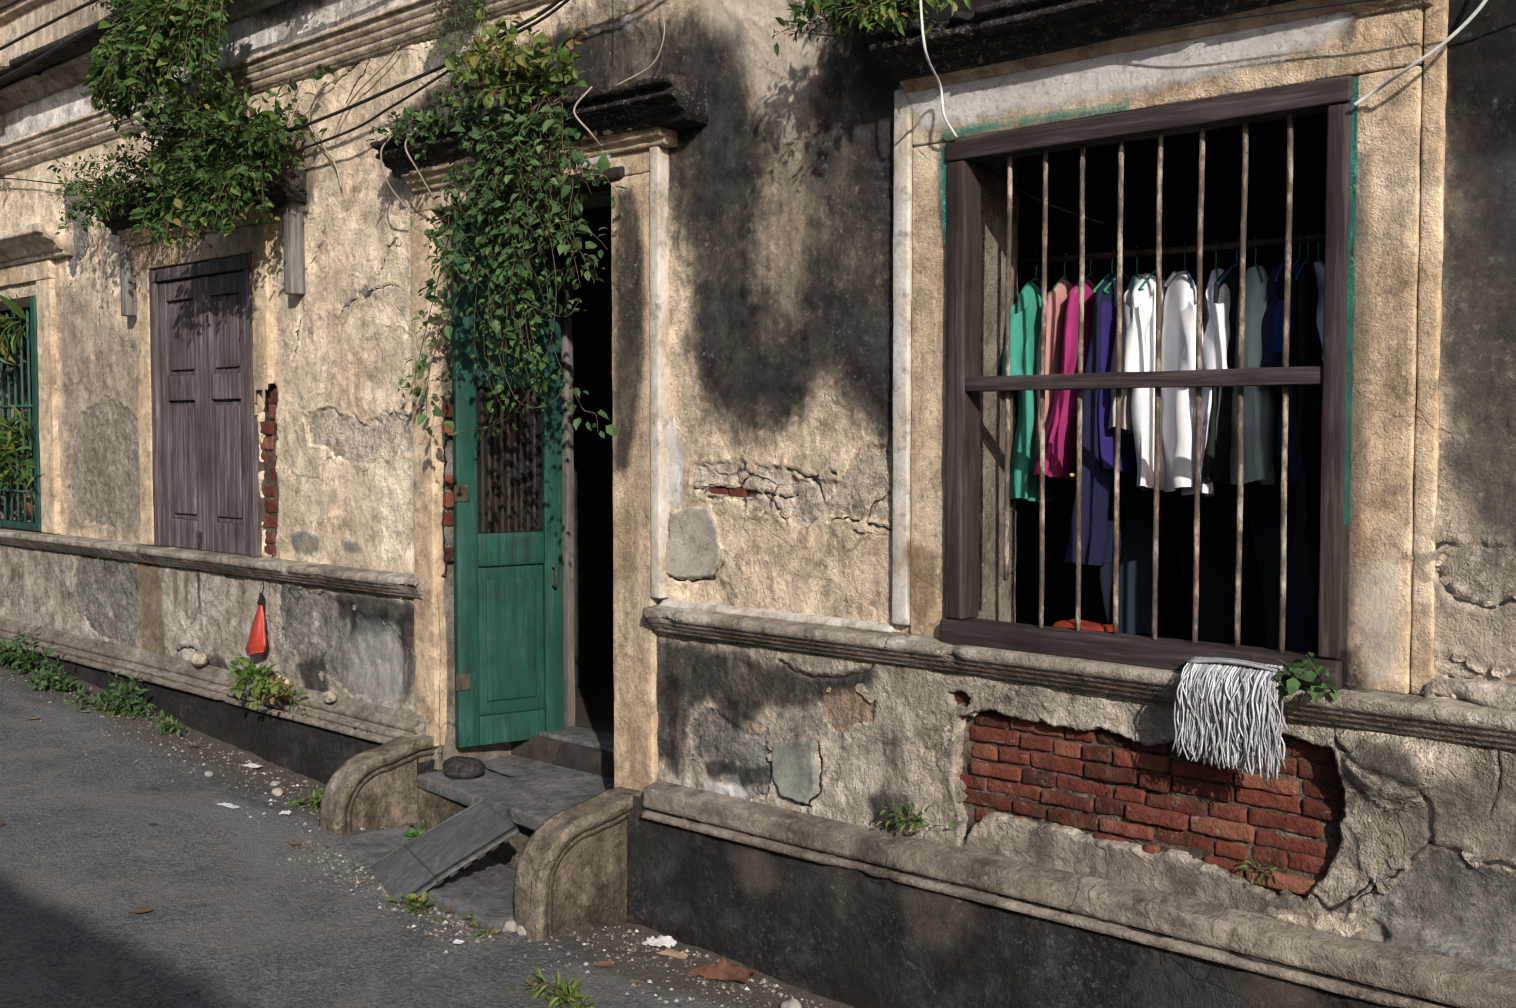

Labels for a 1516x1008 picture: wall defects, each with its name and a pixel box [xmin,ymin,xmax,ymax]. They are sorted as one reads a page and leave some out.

leakage [395,0,1358,469]
leakage [1440,0,1516,545]
flaking render [260,383,279,558]
peeling [693,443,893,532]
leakage [138,562,200,652]
leakage [207,656,229,670]
leakage [297,655,327,692]
leakage [336,594,414,694]
leakage [656,643,873,775]
peeling [1434,652,1516,699]
leakage [704,761,770,797]
flaking render [954,691,1345,898]